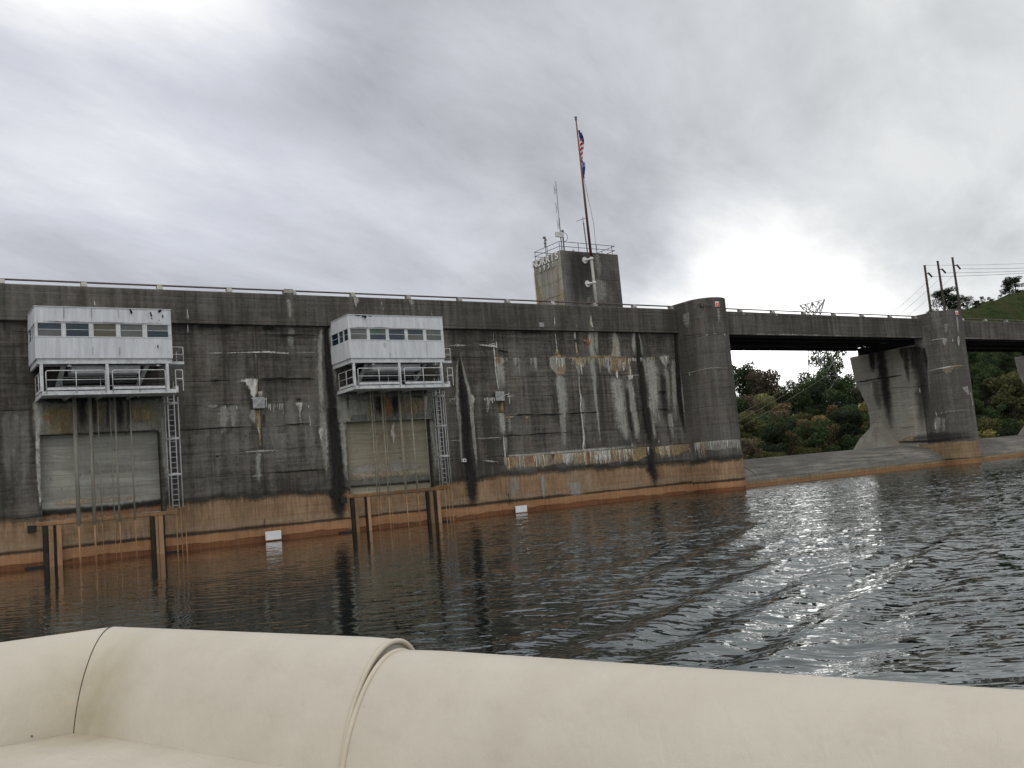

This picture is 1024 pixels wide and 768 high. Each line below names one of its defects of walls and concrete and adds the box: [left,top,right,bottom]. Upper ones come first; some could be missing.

rust [246,410,274,478]
rust [0,433,1024,572]
leakage [449,316,740,503]
leakage [869,349,890,417]